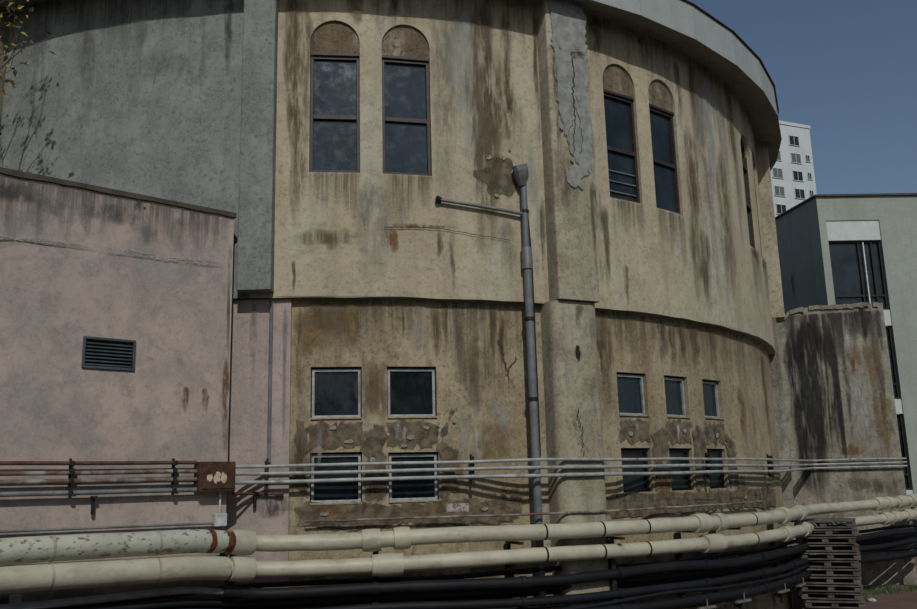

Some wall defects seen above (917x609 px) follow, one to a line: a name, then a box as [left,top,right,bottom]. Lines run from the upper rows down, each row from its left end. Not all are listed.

damp [290,19,311,169]
damp [473,9,512,198]
peeling [549,0,595,189]
crack [568,58,583,157]
rust [384,224,508,252]
spalling [473,147,518,197]
damp [591,187,610,269]
damp [685,139,709,290]
crack [497,340,516,380]
damp [785,308,882,484]
spalling [293,409,523,532]
spalling [606,418,777,519]